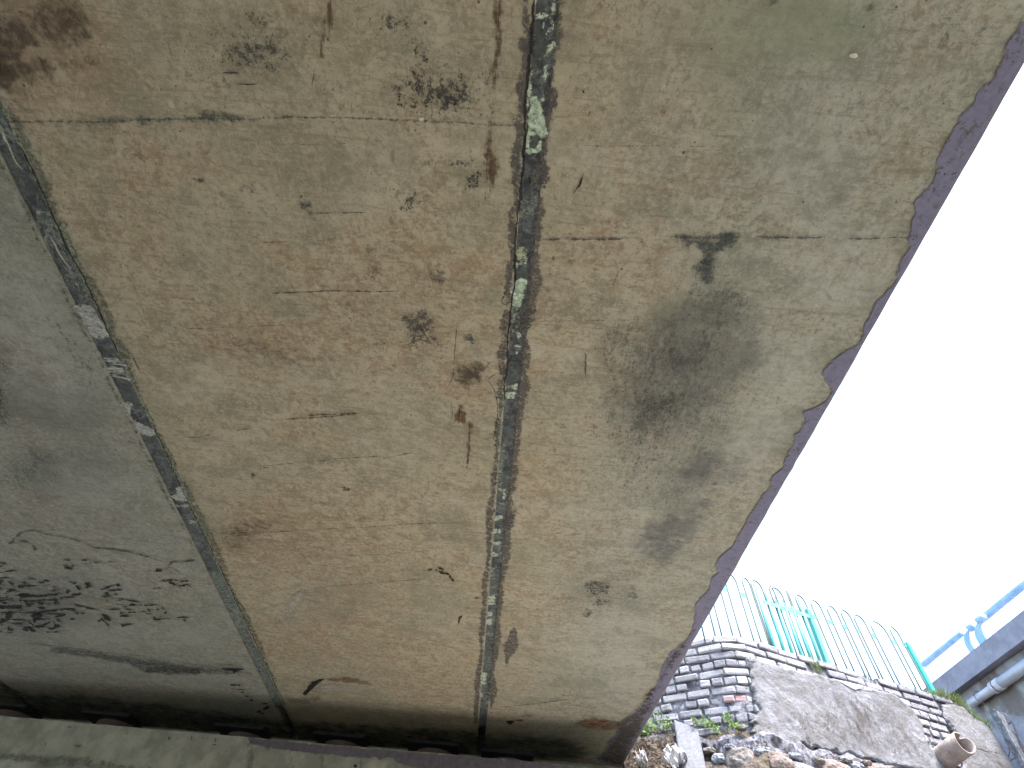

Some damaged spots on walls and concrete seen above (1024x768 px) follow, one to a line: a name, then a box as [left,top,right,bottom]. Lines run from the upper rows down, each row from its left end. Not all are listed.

water stain [0,5,91,91]
corrosion [489,1,502,80]
corrosion [485,130,500,199]
water stain [0,102,294,722]
corrosion [455,405,473,464]
water stain [248,0,1024,768]
peeling [0,559,189,633]